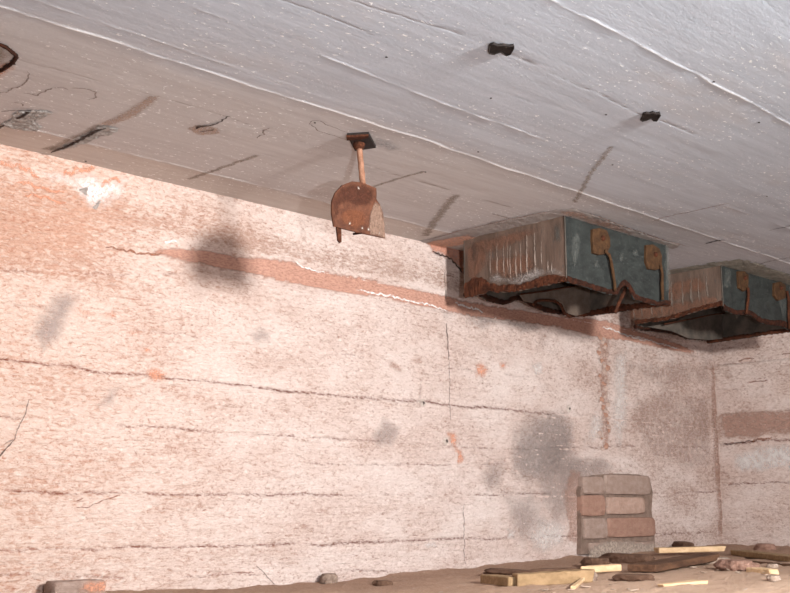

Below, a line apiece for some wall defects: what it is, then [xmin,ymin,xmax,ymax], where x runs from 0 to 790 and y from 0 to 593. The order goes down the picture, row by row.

spalling [0,43,19,74]
crack [2,75,97,99]
spalling [0,103,52,131]
spalling [51,126,119,153]
spalling [189,116,229,135]
crack [0,400,29,456]